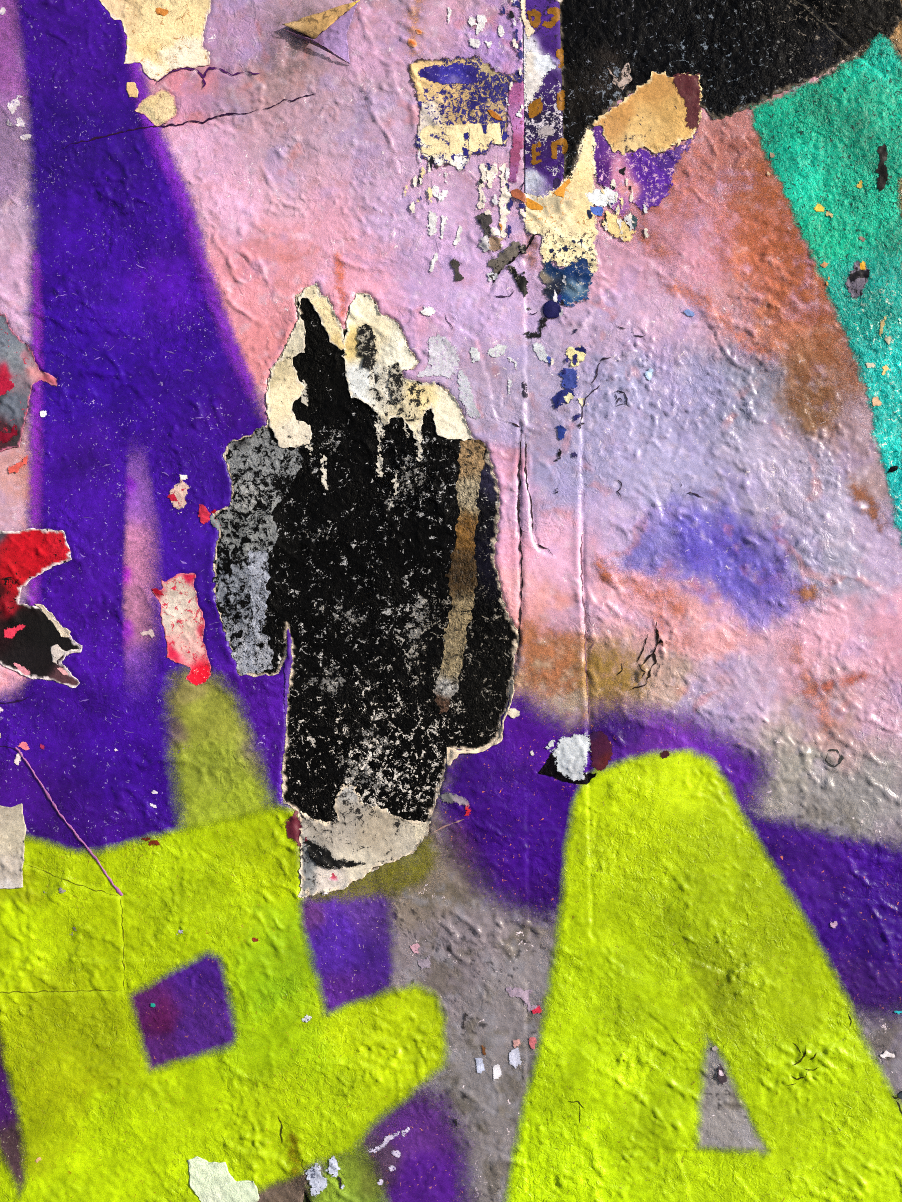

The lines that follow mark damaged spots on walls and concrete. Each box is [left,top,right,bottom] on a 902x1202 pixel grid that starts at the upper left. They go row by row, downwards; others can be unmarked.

peeling [99,0,211,126]
crack [155,67,259,87]
peeling [608,63,632,90]
crack [62,93,316,149]
peeling [600,178,649,240]
peeling [140,573,211,685]
peeling [530,731,613,785]
peeling [438,792,472,816]